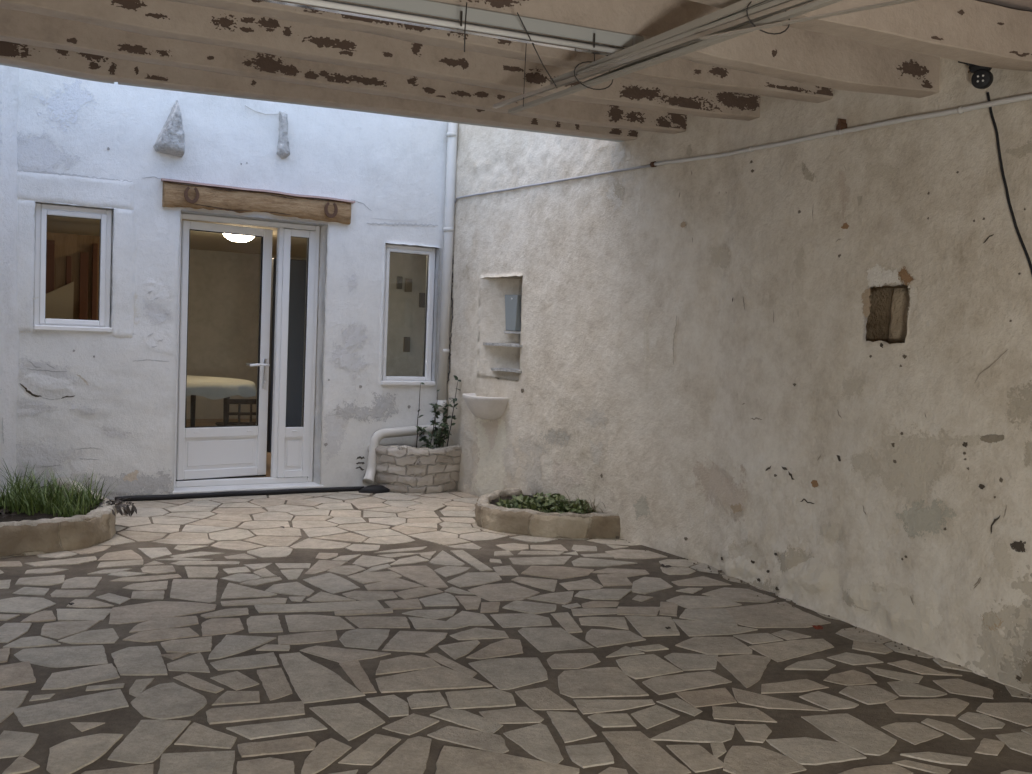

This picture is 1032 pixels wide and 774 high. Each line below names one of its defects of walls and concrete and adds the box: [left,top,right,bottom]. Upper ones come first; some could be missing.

peeling [111,0,170,20]
peeling [0,41,40,58]
peeling [55,38,172,75]
peeling [210,13,357,56]
peeling [242,53,387,87]
peeling [303,8,434,57]
peeling [407,76,517,112]
peeling [503,65,555,86]
peeling [896,59,933,89]
peeling [606,82,833,169]
peeling [861,263,919,322]
leakage [956,540,1032,694]